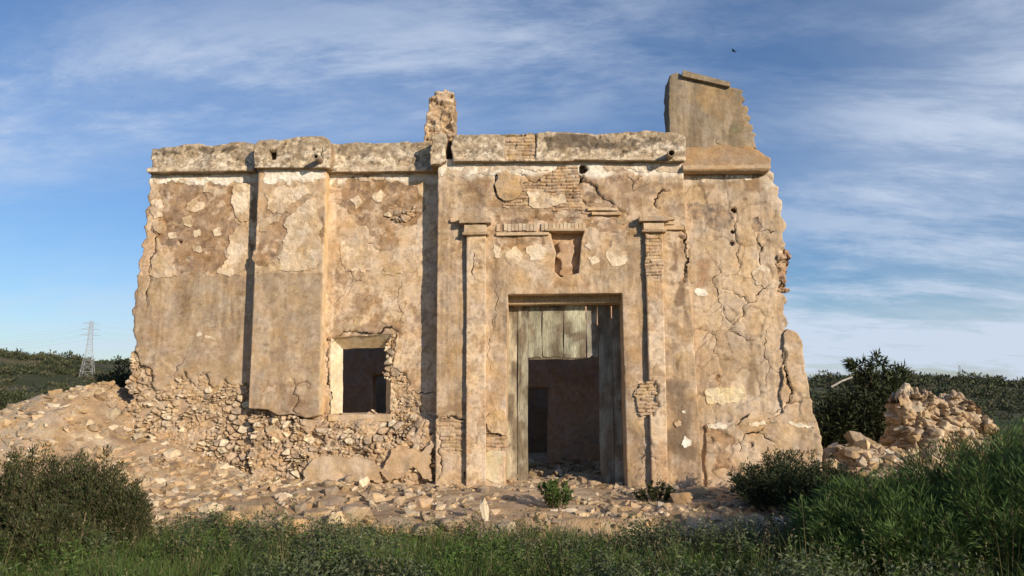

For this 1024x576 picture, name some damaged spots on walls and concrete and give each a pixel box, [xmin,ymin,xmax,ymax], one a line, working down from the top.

flaking render [149,182,323,279]
flaking render [333,175,427,276]
flaking render [490,165,664,278]
crack [576,168,667,215]
flaking render [121,333,466,485]
crack [292,282,402,421]
flaking render [633,381,659,417]
crack [704,214,794,451]